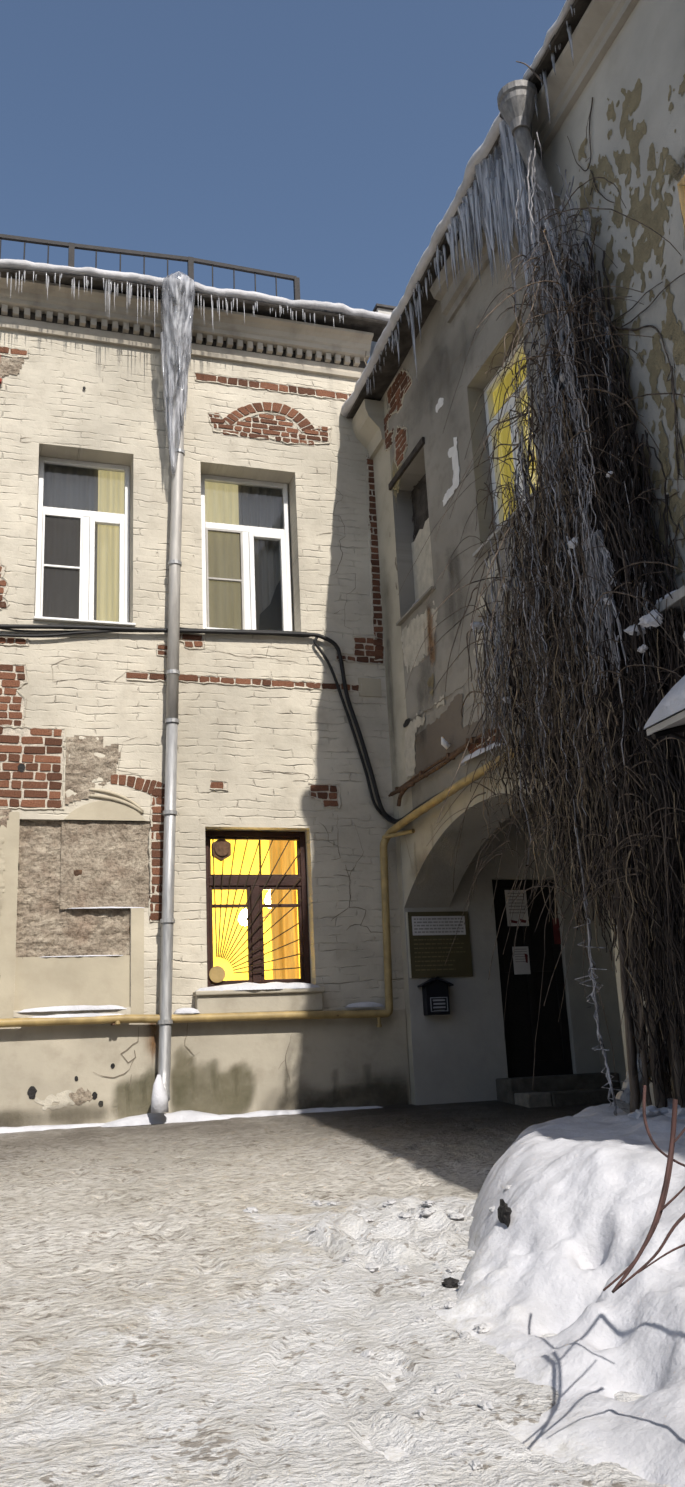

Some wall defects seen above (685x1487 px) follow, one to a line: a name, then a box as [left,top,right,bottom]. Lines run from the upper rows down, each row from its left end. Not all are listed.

peeling [578,74,685,570]
spalling [0,345,30,387]
flaking render [195,372,352,401]
flaking render [208,411,332,447]
peeling [443,437,460,506]
flaking render [0,557,10,611]
flaking render [335,368,444,779]
peeling [473,557,498,659]
flaking render [125,633,362,693]
spalling [0,637,165,959]
water stain [0,1113,28,1127]
water stain [50,1053,252,1123]